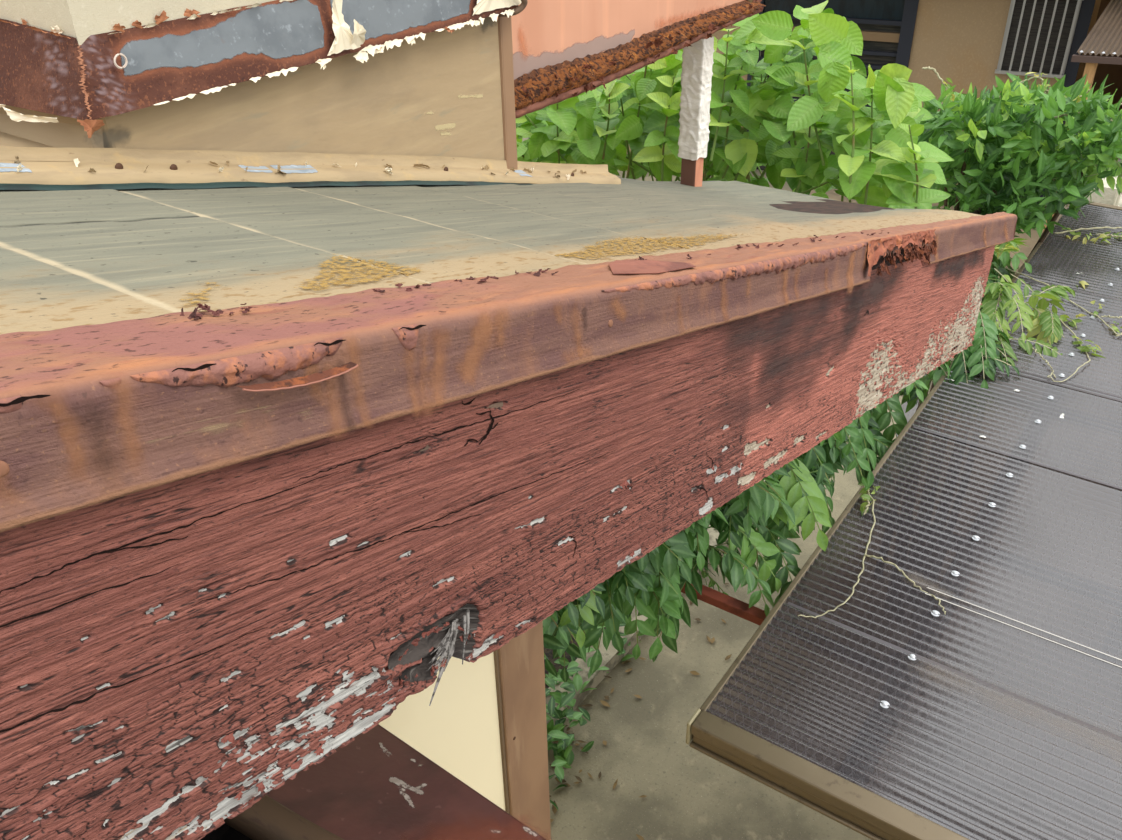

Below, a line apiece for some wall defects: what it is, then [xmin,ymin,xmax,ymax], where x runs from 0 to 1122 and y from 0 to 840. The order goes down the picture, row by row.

rust [75,44,92,119]
peeling [154,83,236,105]
peeling [111,0,521,83]
rust [514,1,766,110]
peeling [853,275,985,420]
peeling [706,431,826,485]
crack [0,389,617,628]
peeling [699,497,713,515]
peeling [617,549,641,567]
peeling [390,620,530,661]
peeling [43,751,122,787]
peeling [120,658,447,840]